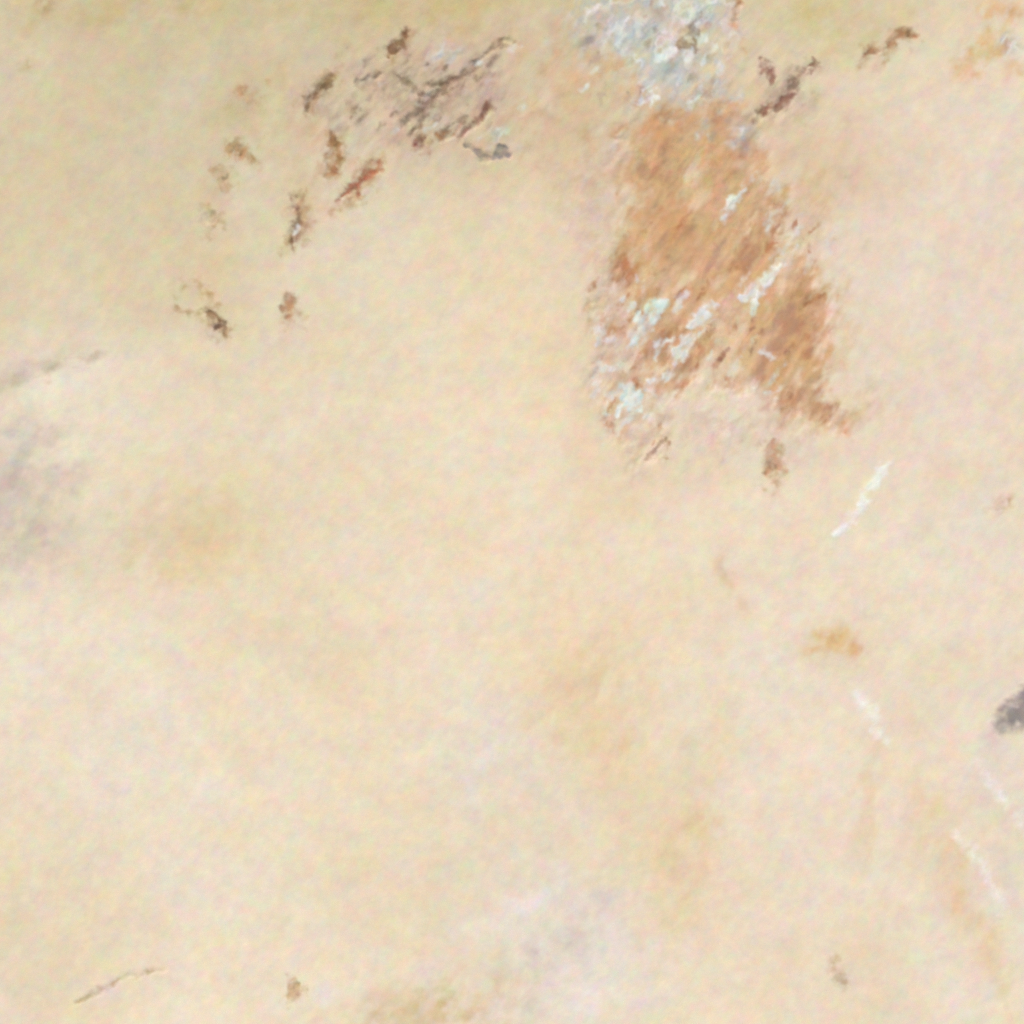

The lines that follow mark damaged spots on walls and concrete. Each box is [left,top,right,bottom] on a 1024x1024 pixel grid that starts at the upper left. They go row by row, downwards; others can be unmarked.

spalling [370,19,427,71]
leakage [518,0,970,118]
spalling [275,61,441,261]
spalling [461,117,531,166]
flaking render [555,40,912,510]
peeling [971,679,1024,752]